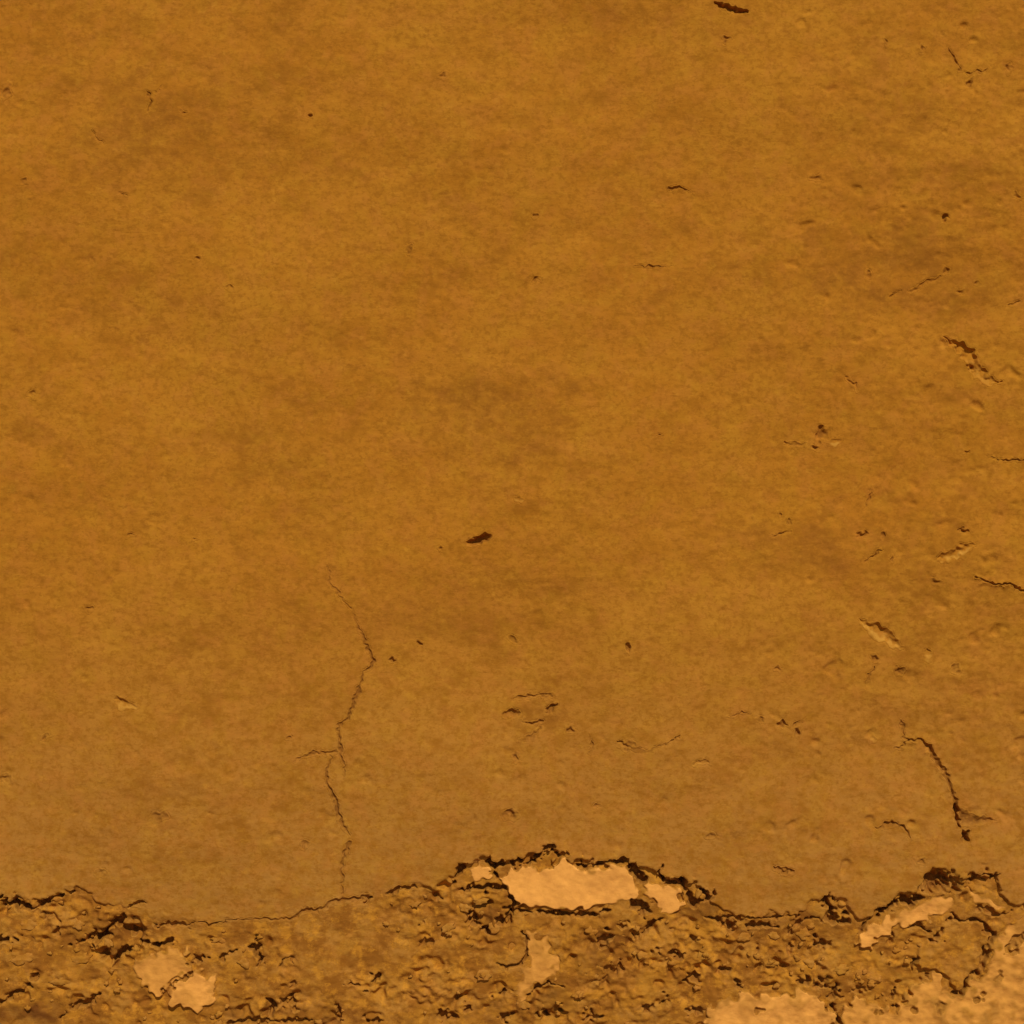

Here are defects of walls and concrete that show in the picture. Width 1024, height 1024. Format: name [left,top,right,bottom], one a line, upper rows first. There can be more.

crack [183,563,378,928]
crack [889,718,999,848]
spalling [0,840,1024,1024]